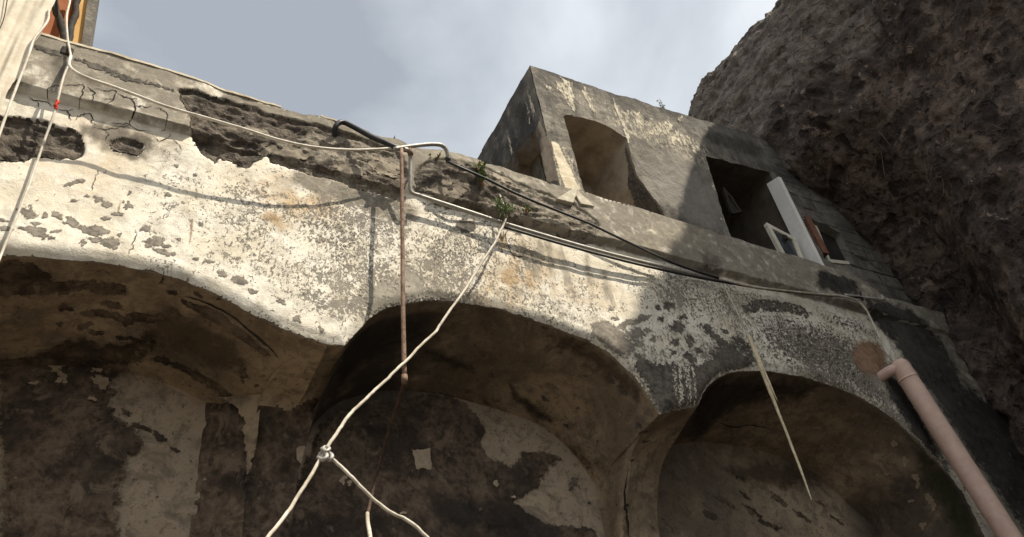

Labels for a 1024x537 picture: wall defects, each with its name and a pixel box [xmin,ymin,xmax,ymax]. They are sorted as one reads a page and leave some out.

flaking render [0,115,85,163]
crack [29,82,181,148]
peeling [0,178,134,250]
flaking render [35,44,892,411]
crack [185,296,278,358]
corrosion [853,341,885,374]
water stain [672,357,809,440]
flaking render [291,392,597,537]